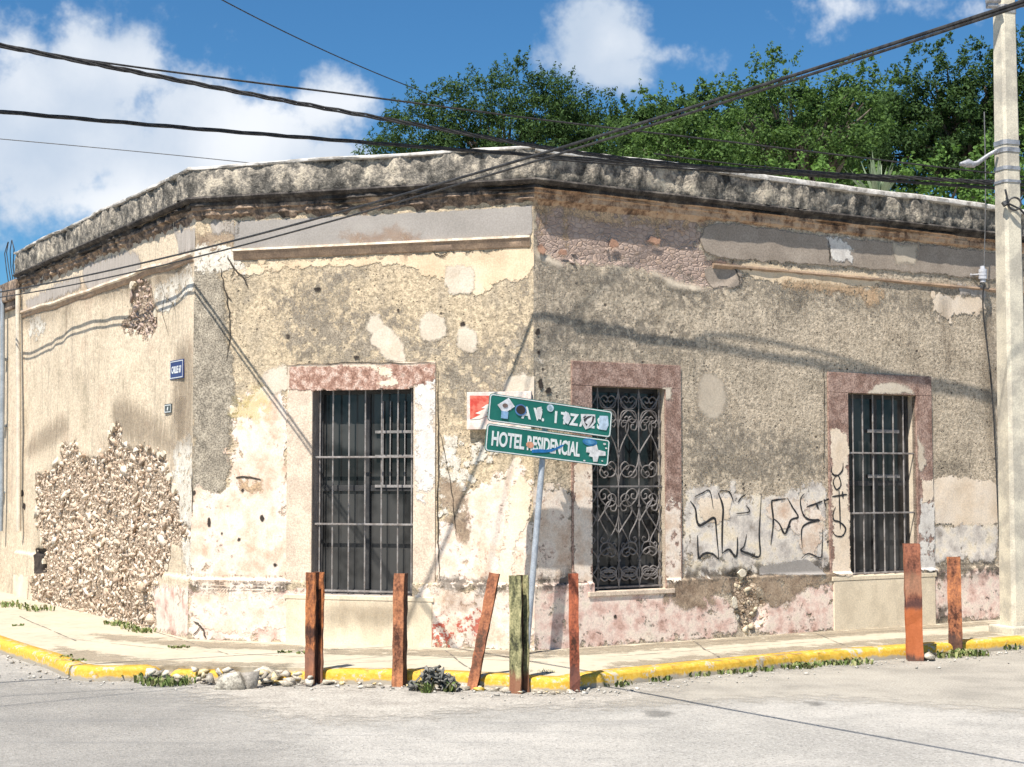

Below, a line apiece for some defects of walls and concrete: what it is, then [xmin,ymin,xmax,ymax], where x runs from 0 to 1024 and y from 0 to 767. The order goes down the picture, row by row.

spalling [534,204,736,290]
spalling [121,278,157,341]
crack [221,255,250,357]
spalling [13,363,853,651]
peeling [917,435,1000,620]